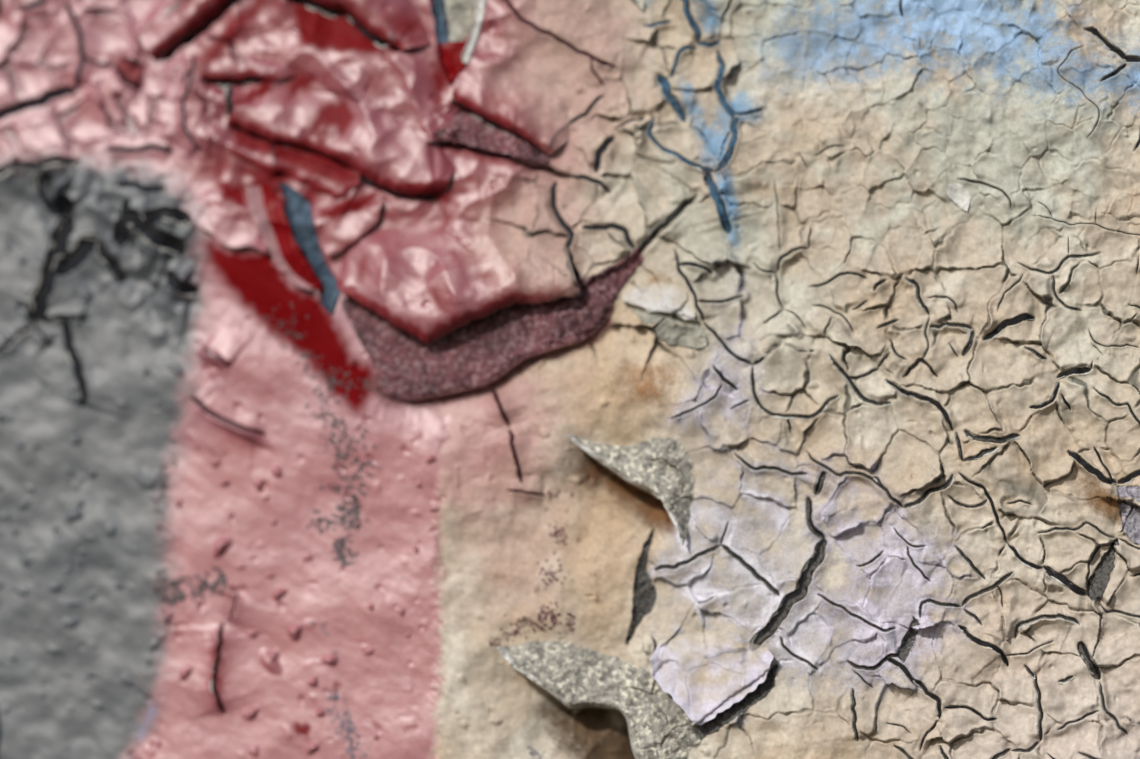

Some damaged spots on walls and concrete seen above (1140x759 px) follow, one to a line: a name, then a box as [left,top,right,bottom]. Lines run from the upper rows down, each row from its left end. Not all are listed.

peeling [134,0,230,61]
peeling [311,0,432,51]
crack [0,0,435,200]
crack [0,155,199,407]
peeling [186,51,707,401]
crack [191,397,266,435]
crack [436,0,1140,759]
peeling [566,434,694,545]
crack [210,594,238,716]
peeling [497,632,778,759]
peeling [625,528,657,645]
peeling [897,617,920,663]